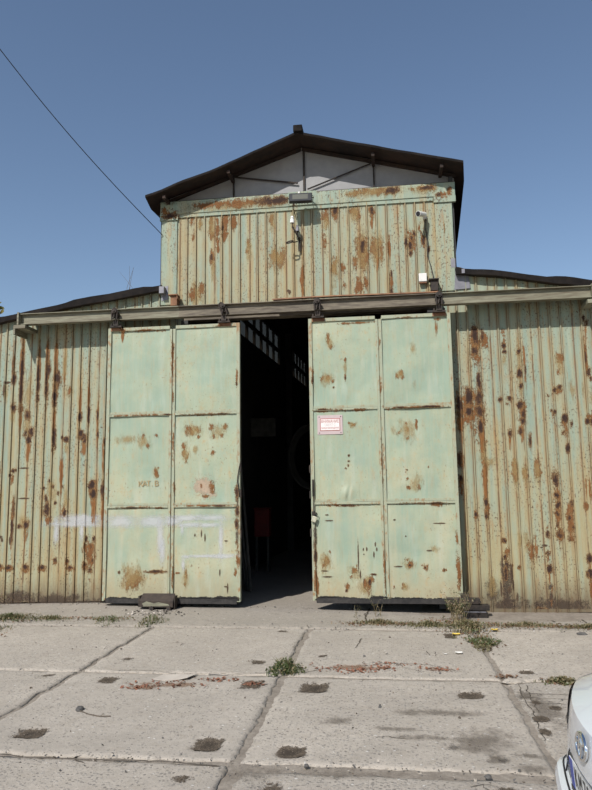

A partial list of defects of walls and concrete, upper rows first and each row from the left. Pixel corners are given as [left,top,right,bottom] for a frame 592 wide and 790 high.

rust [161,195,289,276]
rust [320,183,452,294]
rust [11,339,57,453]
rust [172,412,228,463]
rust [454,319,493,520]
rust [501,328,532,446]
rust [560,409,573,454]
rust [0,480,105,582]
rust [313,525,332,597]
rust [345,551,428,596]
rust [487,538,521,606]
rust [518,464,589,606]